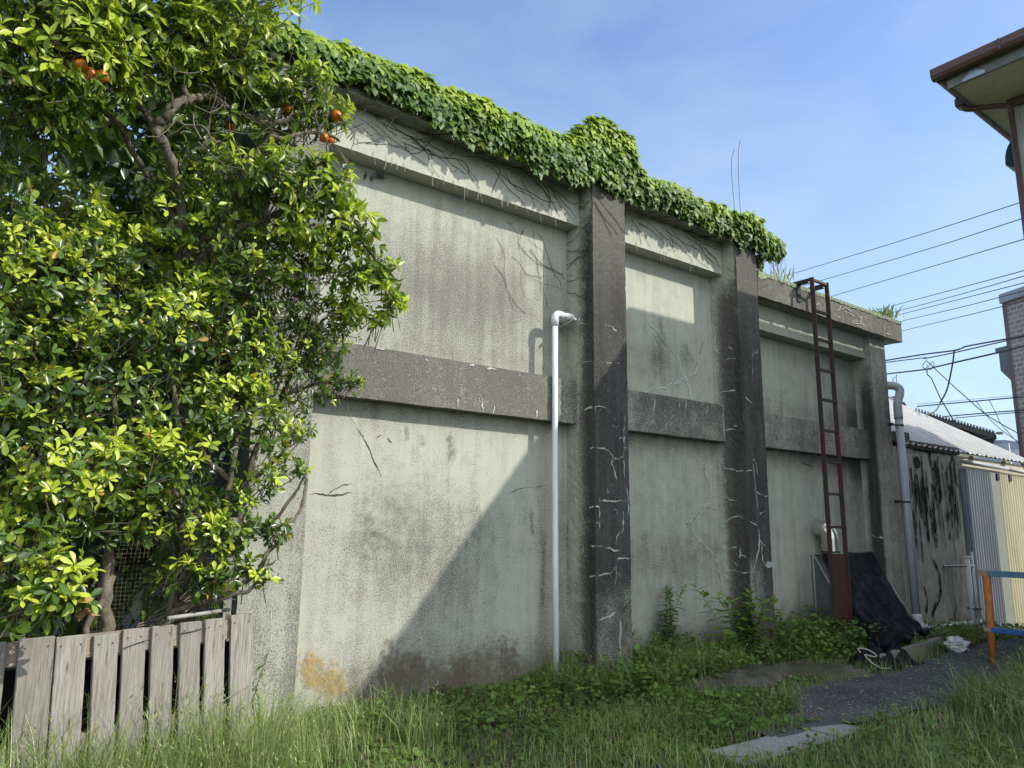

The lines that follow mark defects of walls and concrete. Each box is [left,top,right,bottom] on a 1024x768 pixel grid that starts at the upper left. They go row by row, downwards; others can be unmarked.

crack [310,483,353,496]
crack [346,403,392,475]
crack [585,406,630,583]
crack [665,441,772,586]
damp [909,449,961,619]